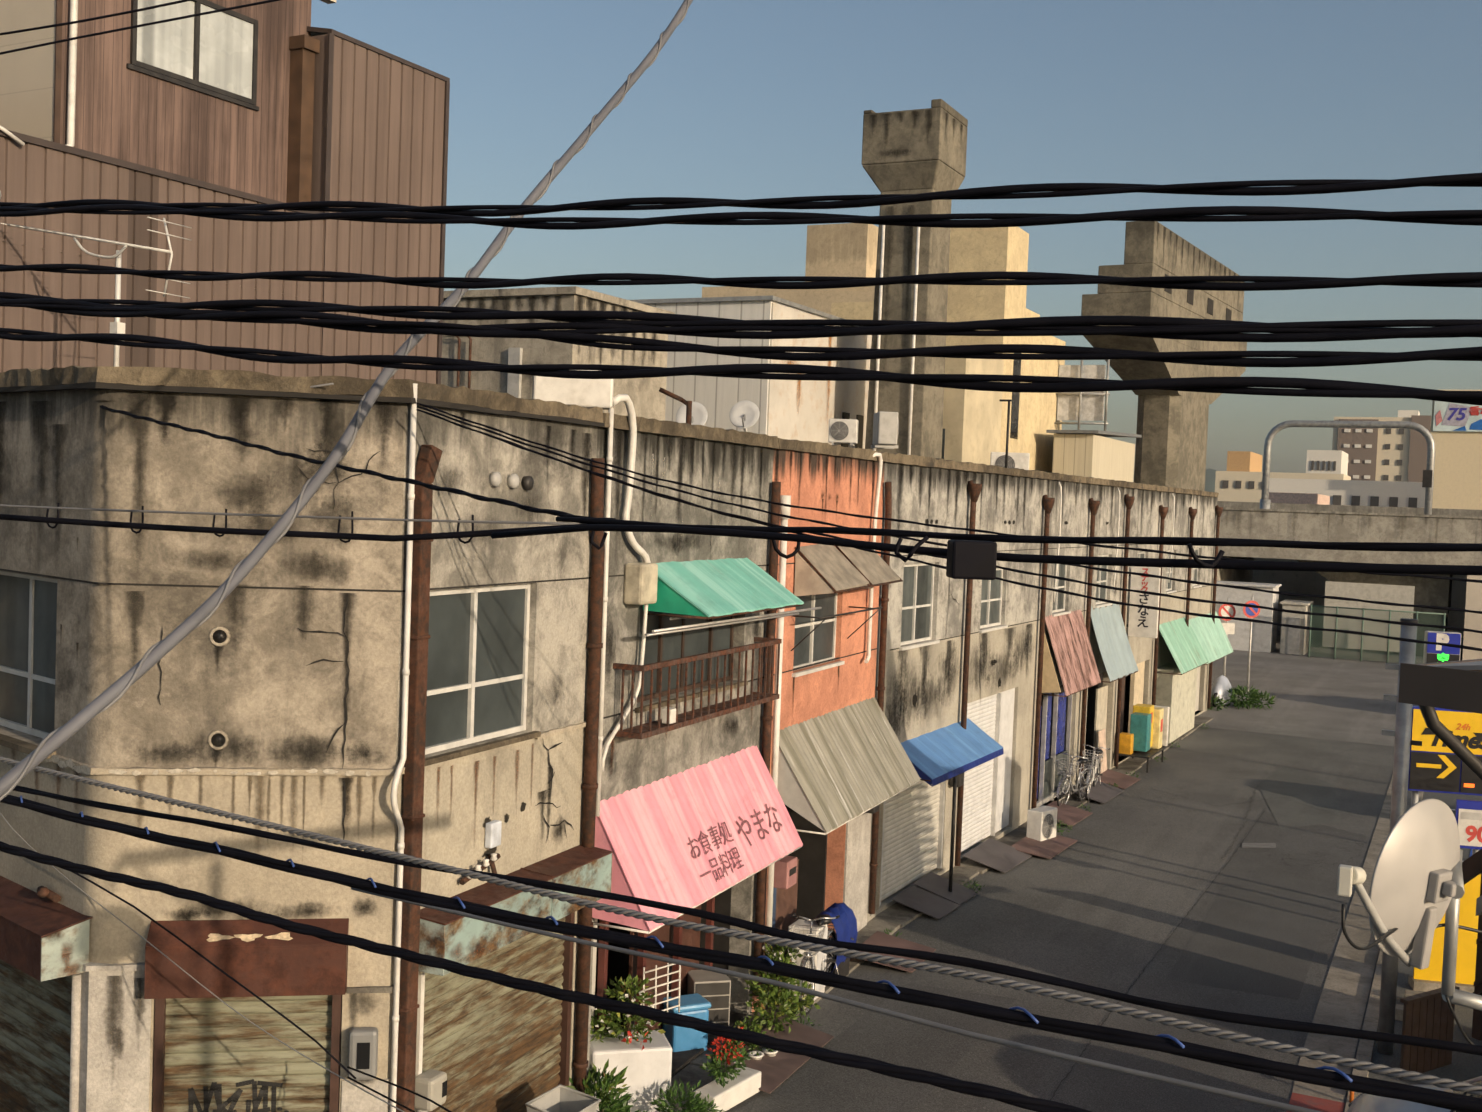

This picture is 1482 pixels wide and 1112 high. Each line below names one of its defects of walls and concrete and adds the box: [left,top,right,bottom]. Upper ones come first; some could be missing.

water stain [32,401,64,483]
water stain [131,392,175,508]
water stain [231,397,254,442]
water stain [128,591,143,651]
water stain [201,739,253,762]
water stain [232,738,376,829]
water stain [293,554,354,672]
crack [298,593,350,839]
crack [537,742,574,841]
water stain [889,640,952,732]
water stain [975,624,1032,683]
water stain [107,976,144,1052]